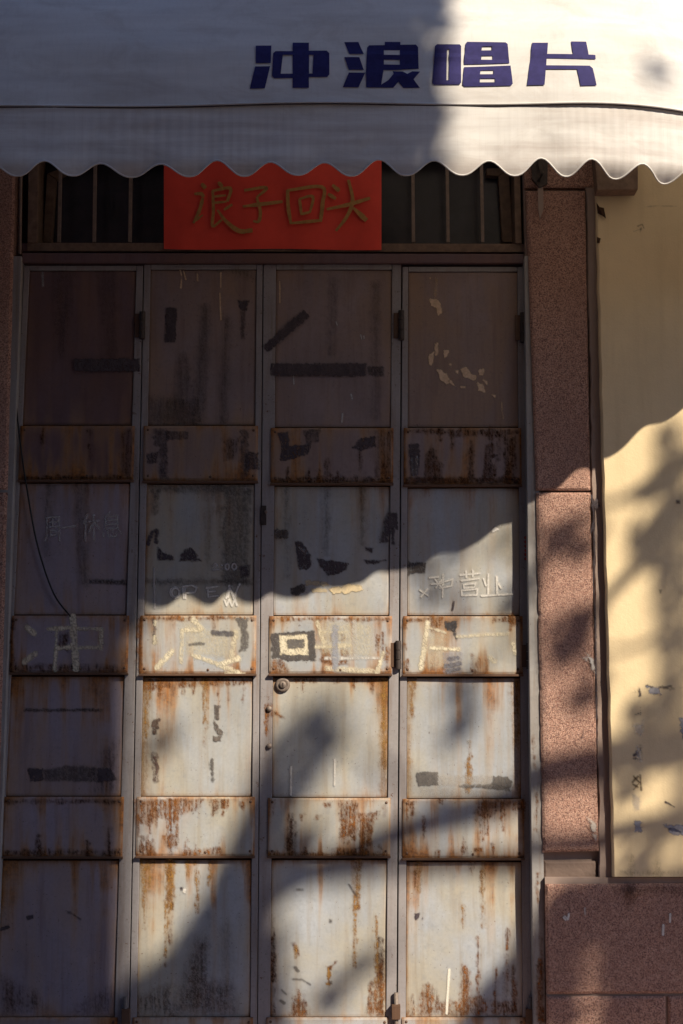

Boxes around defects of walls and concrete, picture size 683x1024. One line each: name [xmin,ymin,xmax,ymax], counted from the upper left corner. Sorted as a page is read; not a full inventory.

peeling [428,342,503,418]
corrosion [138,667,251,737]
corrosion [135,798,244,966]
corrosion [324,802,385,964]
corrosion [368,916,386,1015]
corrosion [410,930,518,1017]